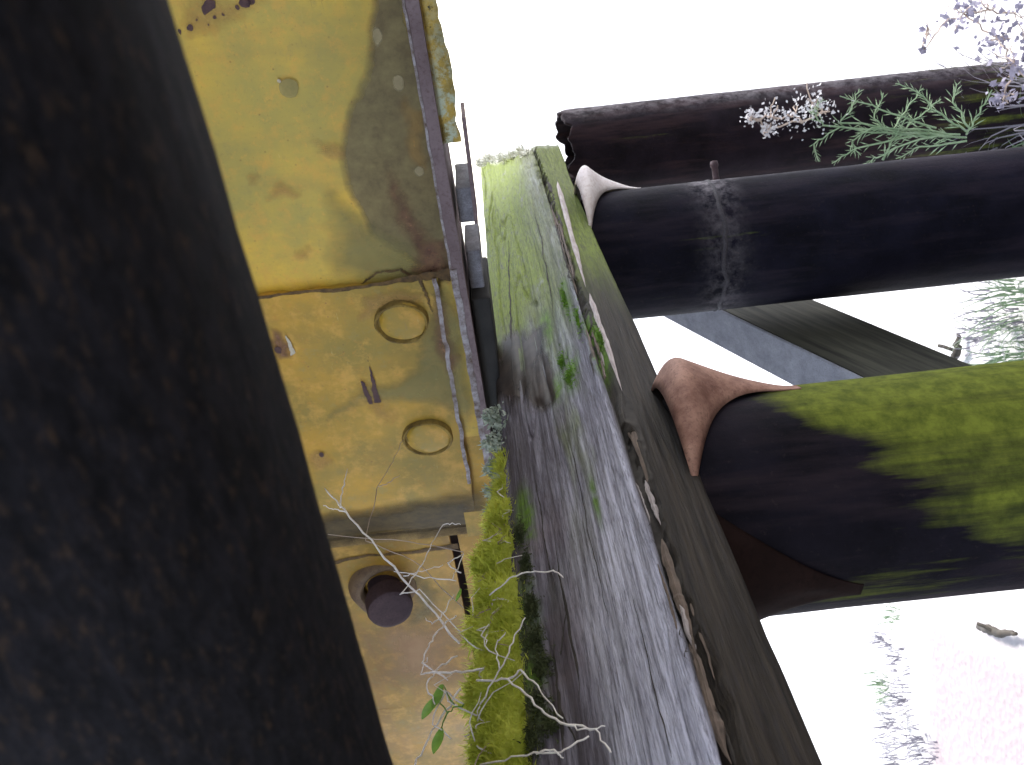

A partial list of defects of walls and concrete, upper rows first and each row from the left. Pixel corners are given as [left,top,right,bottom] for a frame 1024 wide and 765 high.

water stain [344,0,449,277]